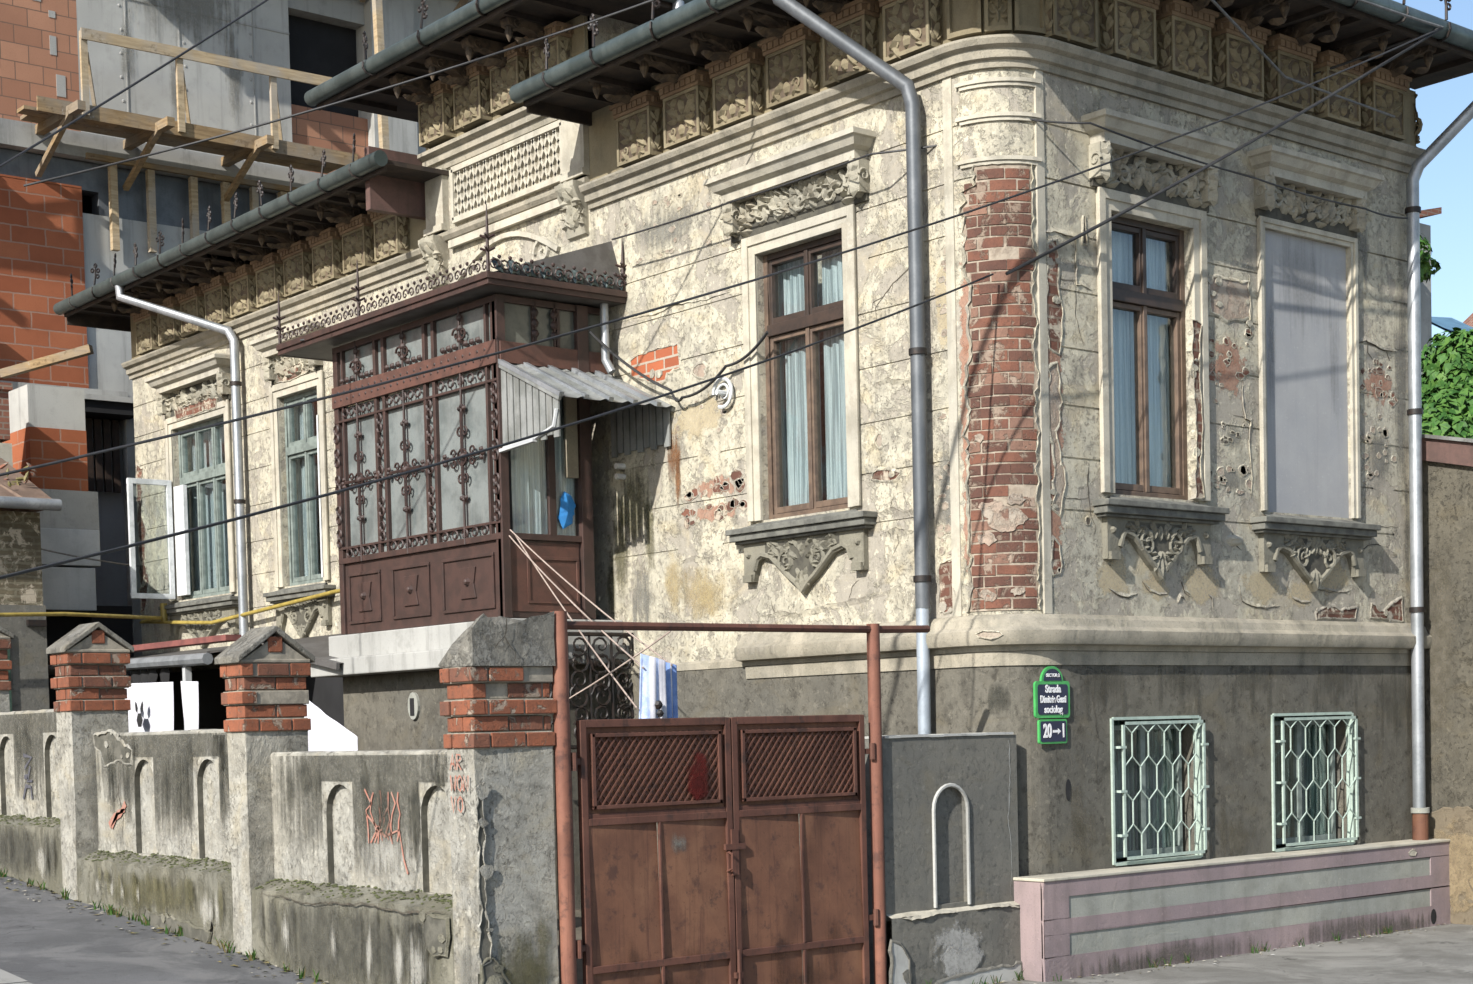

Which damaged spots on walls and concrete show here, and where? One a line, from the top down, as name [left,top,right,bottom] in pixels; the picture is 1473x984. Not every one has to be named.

flaking render [629,342,730,438]
flaking render [935,163,1067,615]
flaking render [1186,274,1253,500]
flaking render [681,468,747,530]
damp [608,478,653,622]
damp [89,732,229,826]
damp [258,898,426,984]